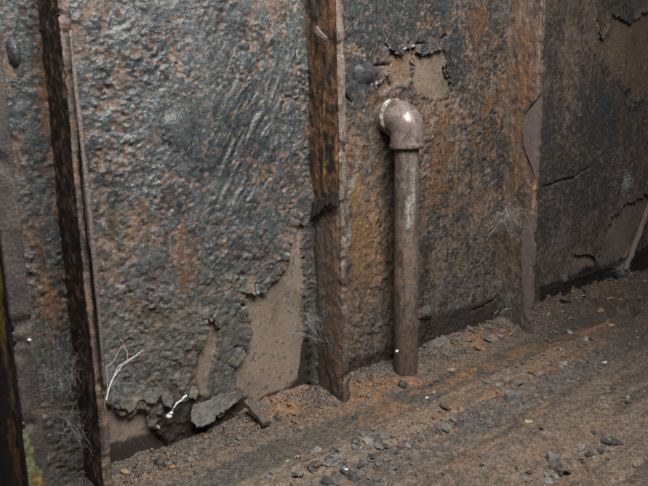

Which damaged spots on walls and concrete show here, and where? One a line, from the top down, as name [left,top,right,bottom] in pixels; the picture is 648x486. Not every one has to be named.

peeling [370,40,455,99]
peeling [521,97,540,178]
crack [521,132,589,187]
peeling [188,190,344,428]
peeling [521,214,535,325]
peeling [563,188,648,284]